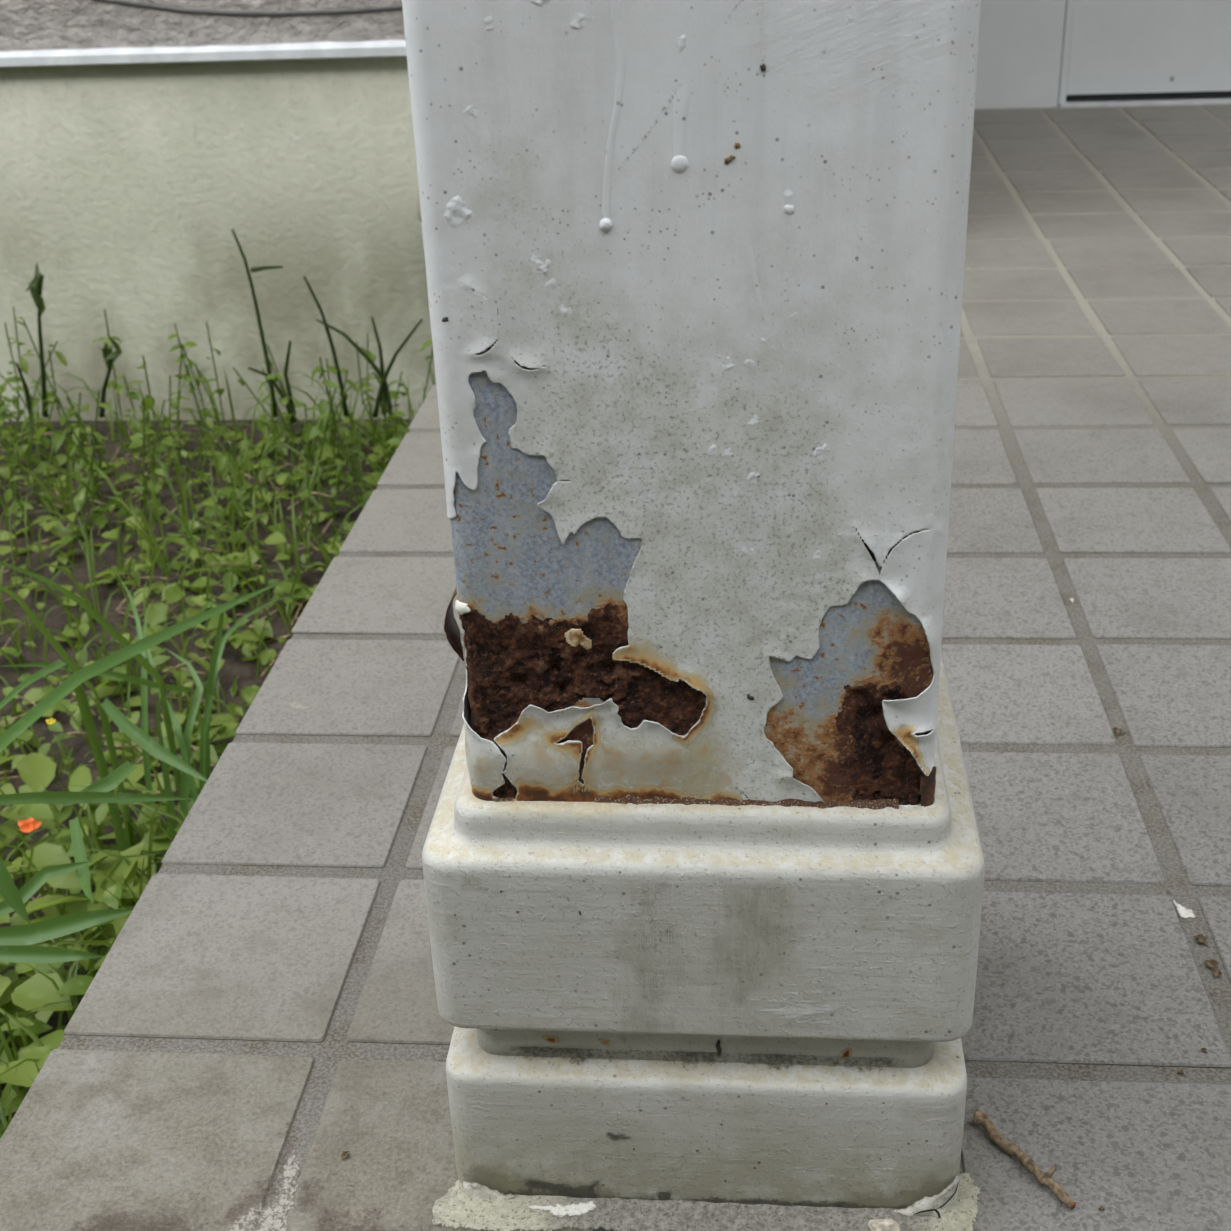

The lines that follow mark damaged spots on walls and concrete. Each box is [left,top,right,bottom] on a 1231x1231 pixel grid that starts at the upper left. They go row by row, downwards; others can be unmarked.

peeling [444,371,707,798]
crack [856,528,927,561]
corrosion [471,642,899,810]
peeling [764,561,937,807]
corrosion [893,725,929,775]